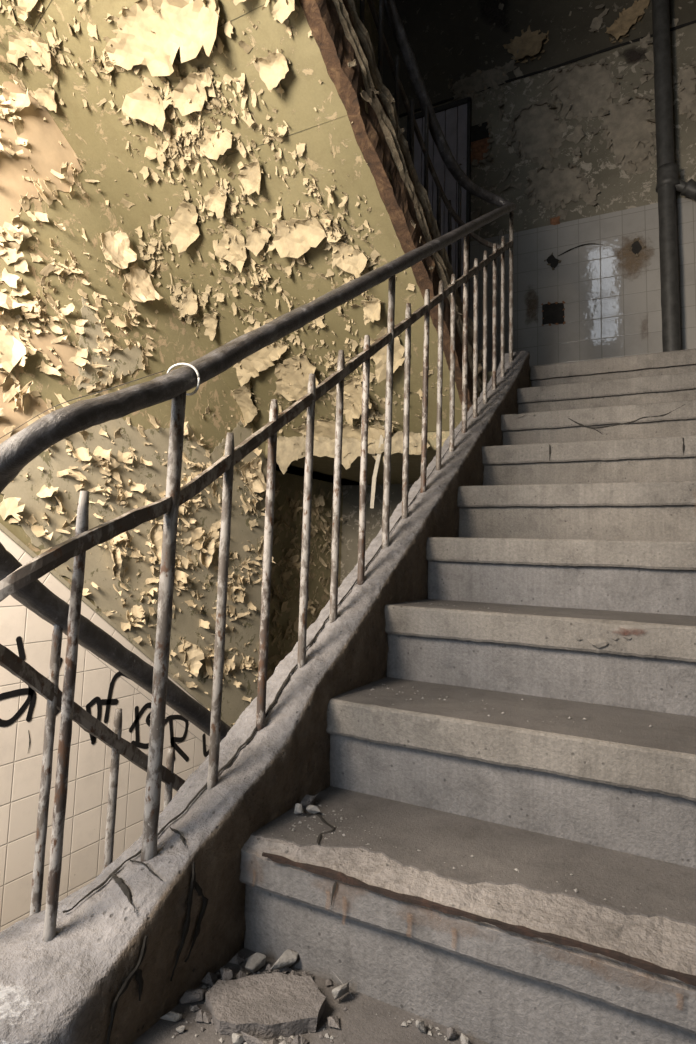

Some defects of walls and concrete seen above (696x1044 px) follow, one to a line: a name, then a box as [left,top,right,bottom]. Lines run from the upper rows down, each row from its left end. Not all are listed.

peeling [0,0,380,444]
flaking render [333,0,482,393]
peeling [0,413,170,554]
peeling [55,515,164,657]
peeling [168,289,446,726]
corrosion [262,852,696,986]